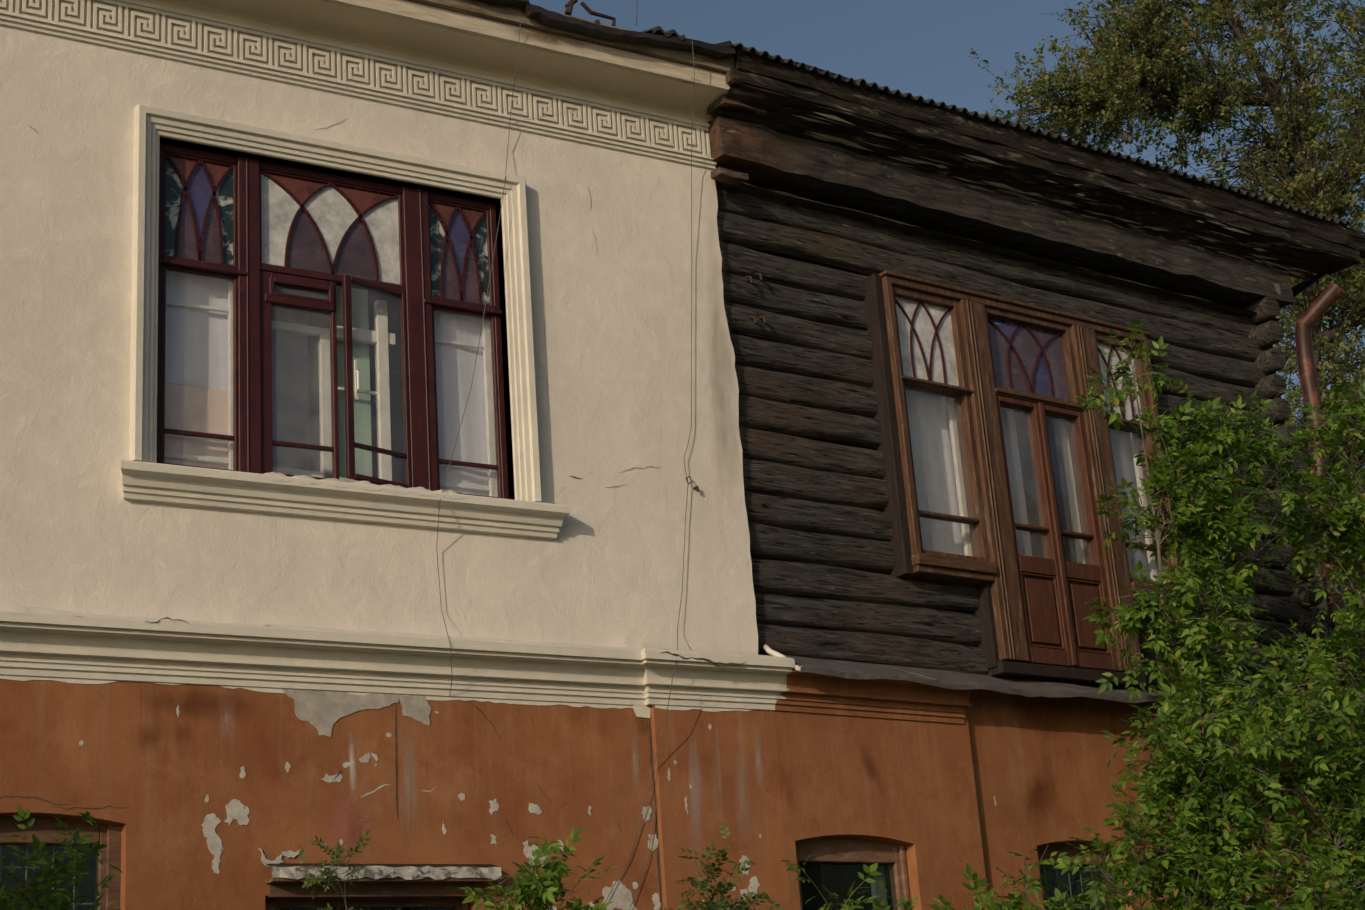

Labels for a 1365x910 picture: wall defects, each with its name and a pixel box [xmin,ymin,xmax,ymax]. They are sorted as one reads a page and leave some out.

crack [570,466,659,488]
flaking render [282,689,439,737]
crack [1,796,130,809]
peeling [202,794,250,874]
peeling [548,880,638,910]
peeling [652,893,661,910]